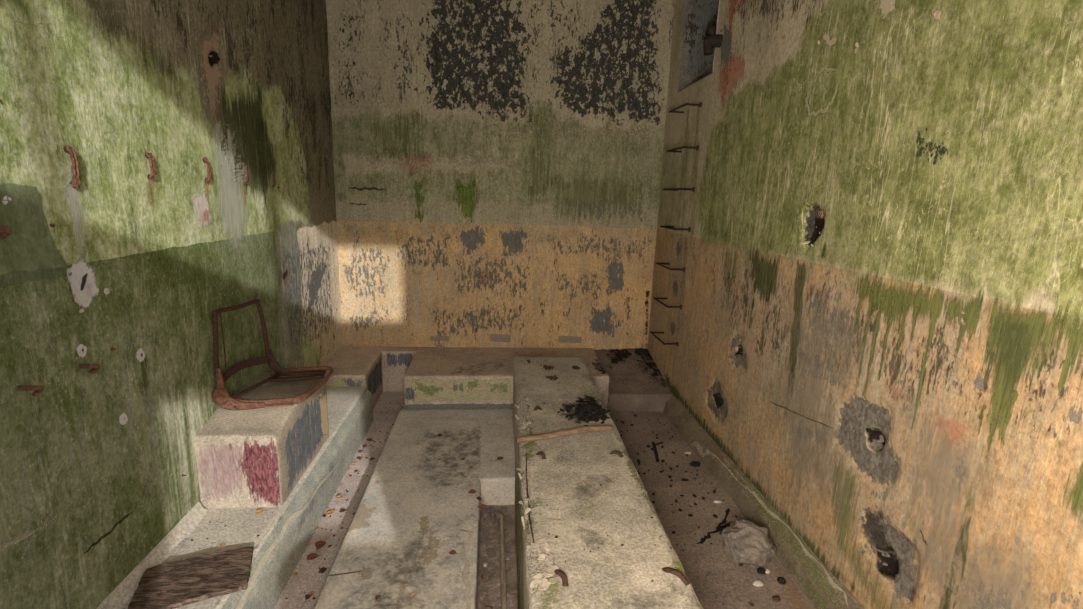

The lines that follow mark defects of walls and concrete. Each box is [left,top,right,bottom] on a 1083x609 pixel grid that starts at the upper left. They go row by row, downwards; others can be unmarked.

damp [683,0,735,79]
damp [388,0,666,222]
hole [800,205,826,247]
flaking render [728,333,747,370]
damp [826,271,1083,449]
flaking render [707,380,727,423]
flaking render [795,347,918,601]